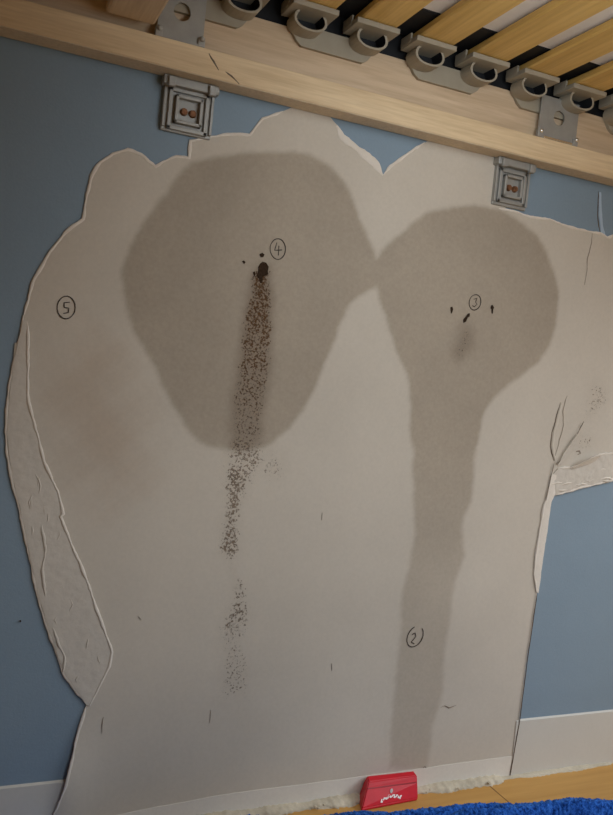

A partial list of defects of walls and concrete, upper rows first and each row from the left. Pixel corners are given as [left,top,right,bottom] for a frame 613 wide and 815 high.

leakage [13,145,563,773]
peeling [53,208,613,815]
crack [546,397,584,499]